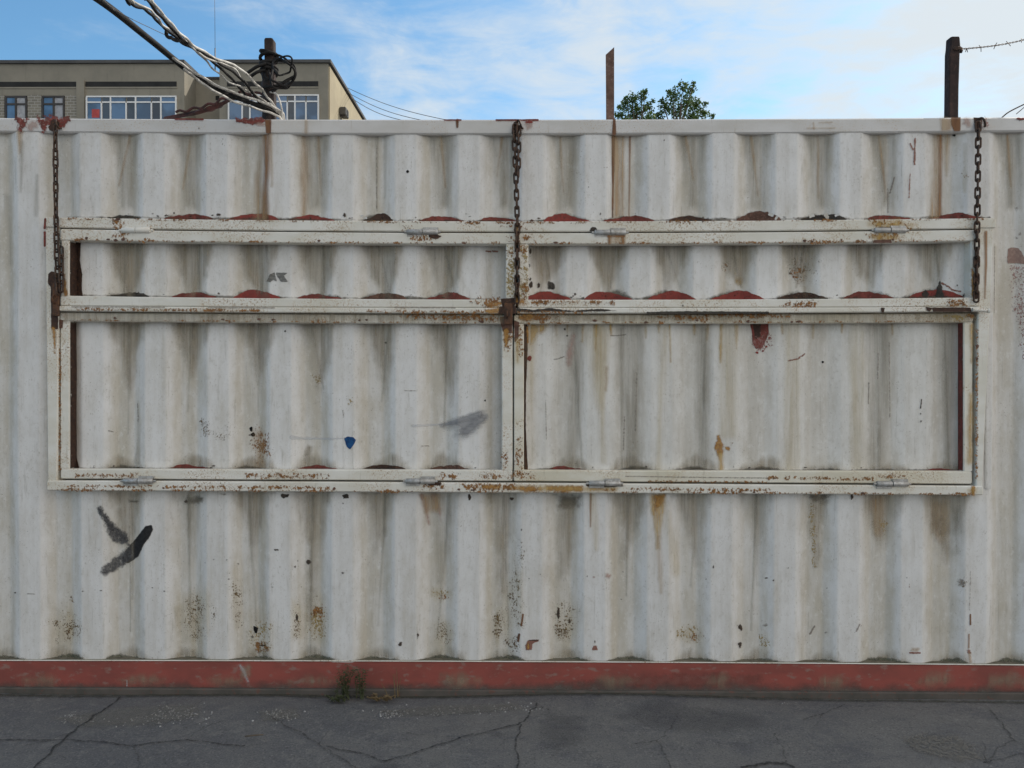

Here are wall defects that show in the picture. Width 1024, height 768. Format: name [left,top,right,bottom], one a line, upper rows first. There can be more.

rust [578,118,663,244]
rust [789,117,989,284]
rust [48,272,276,470]
rust [295,219,860,357]
peeling [750,324,773,354]
rust [876,218,995,541]
peeling [1007,247,1024,359]
rust [57,427,336,493]
rust [377,435,905,532]
crack [0,697,244,768]
crack [288,703,537,768]
crack [741,739,795,768]